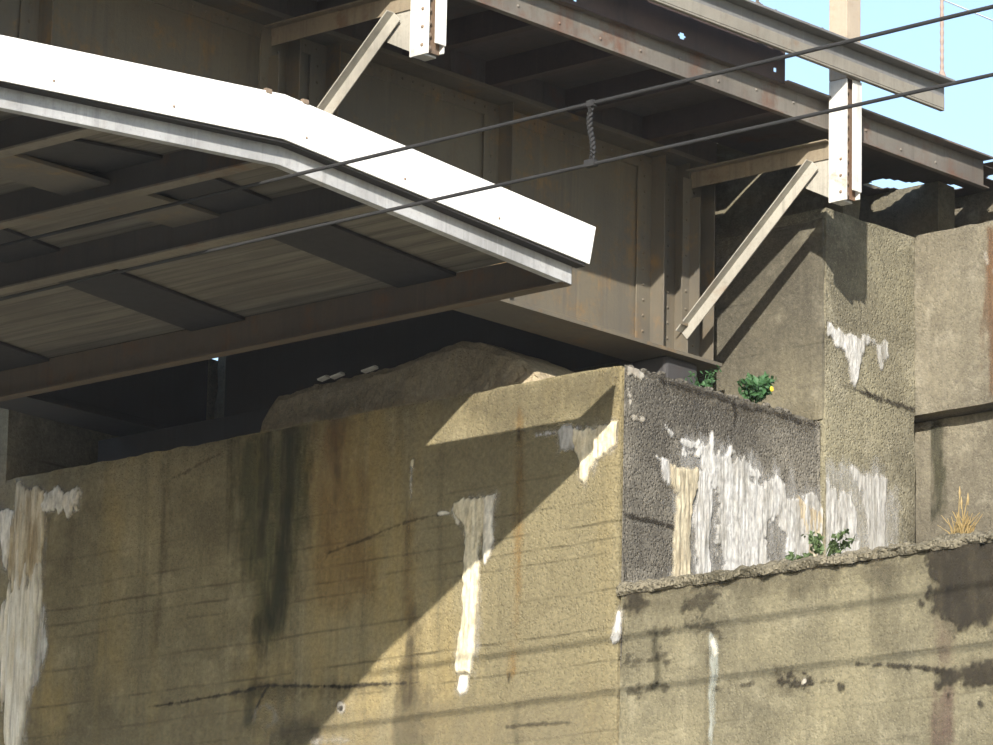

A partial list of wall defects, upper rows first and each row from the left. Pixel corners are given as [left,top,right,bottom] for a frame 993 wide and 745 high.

efflorescence [827,322,889,386]
rust [985,230,993,363]
damp [0,482,81,745]
damp [230,427,308,632]
efflorescence [438,494,494,694]
efflorescence [536,421,617,482]
efflorescence [656,427,887,577]